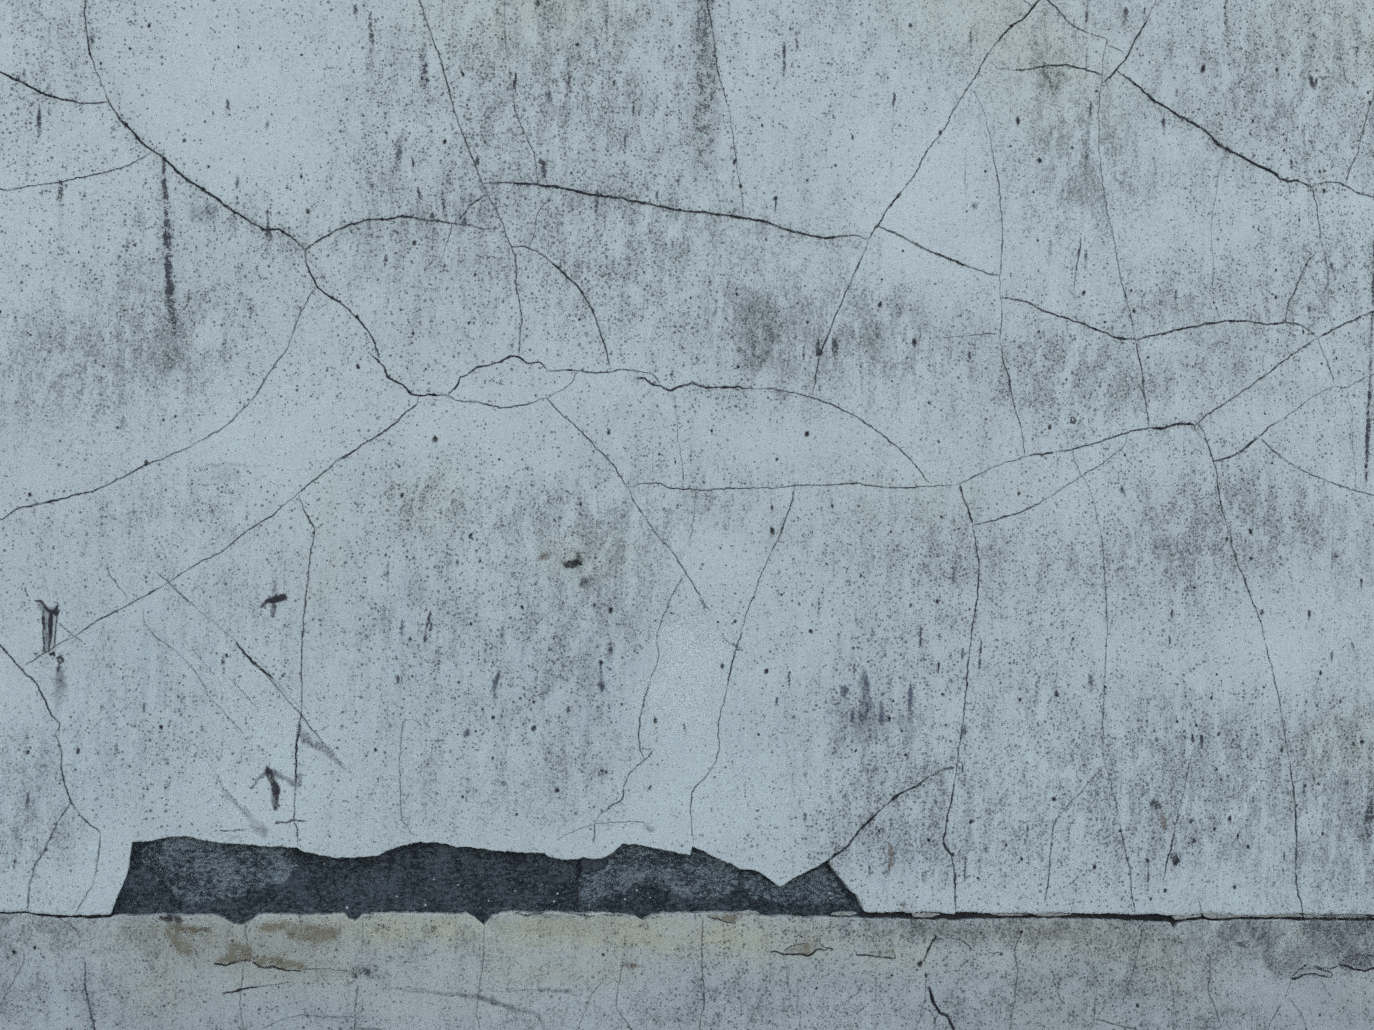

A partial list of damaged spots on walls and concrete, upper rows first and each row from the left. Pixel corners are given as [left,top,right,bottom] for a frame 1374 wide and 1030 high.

crack [84,0,101,82]
crack [419,0,1374,277]
crack [0,71,925,842]
crack [971,245,1374,627]
crack [0,642,112,930]
peeling [213,940,306,972]
spalling [111,836,861,957]
crack [699,910,759,1029]
crack [928,986,955,1030]
crack [830,468,1374,968]